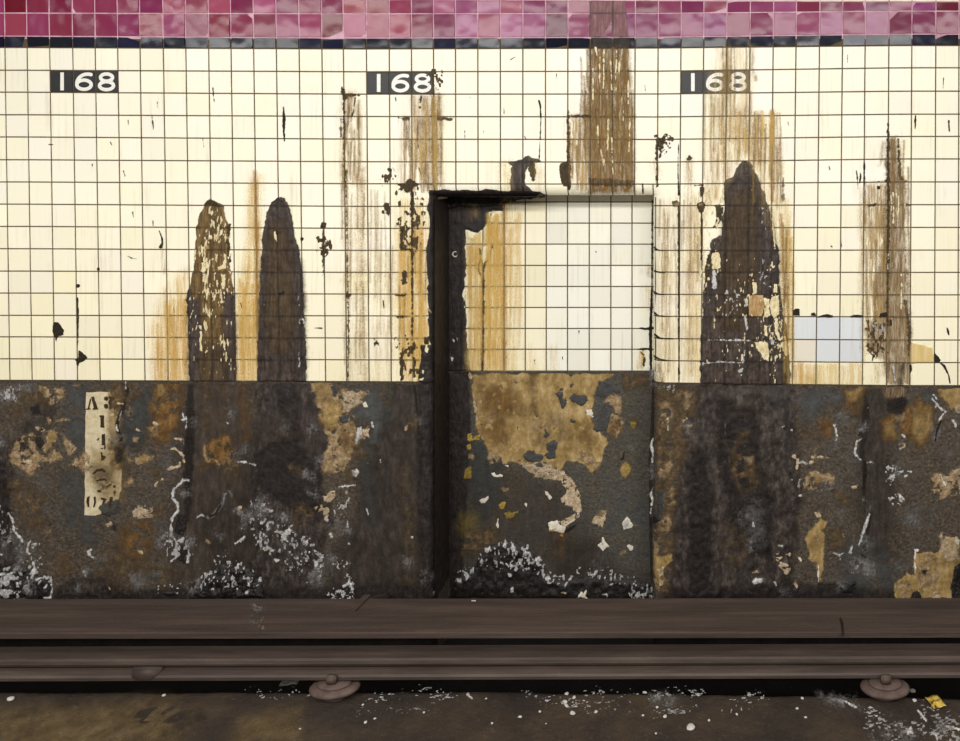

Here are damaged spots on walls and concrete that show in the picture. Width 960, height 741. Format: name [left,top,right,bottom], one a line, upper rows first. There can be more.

corrosion [340,86,360,238]
corrosion [346,250,364,378]
corrosion [380,69,453,382]
leakage [0,160,896,629]
corrosion [468,201,513,372]
corrosion [559,1,633,193]
corrosion [725,110,785,202]
corrosion [864,123,912,386]
peeling [461,372,697,592]
peeling [776,512,827,588]
peeling [894,532,960,598]